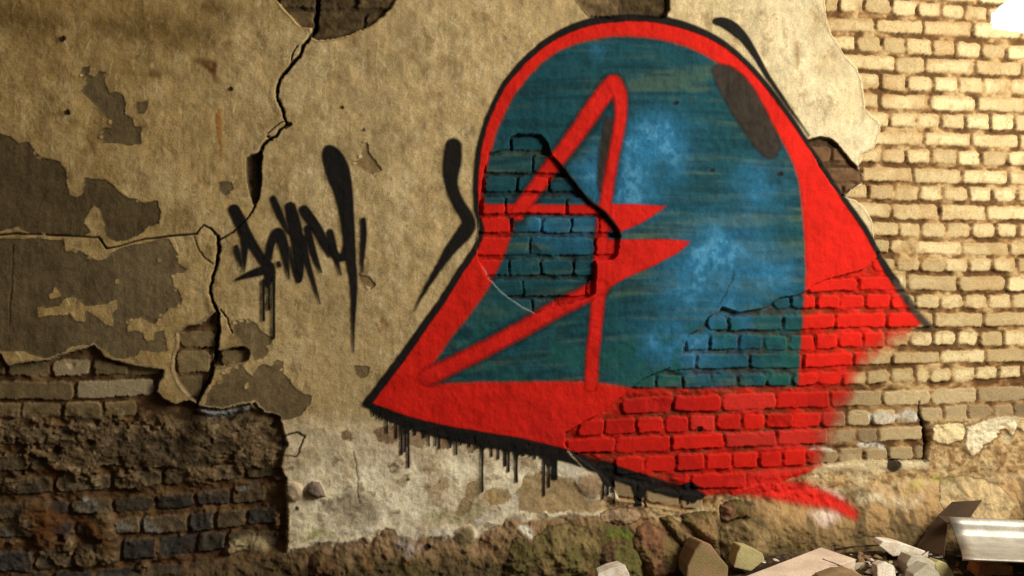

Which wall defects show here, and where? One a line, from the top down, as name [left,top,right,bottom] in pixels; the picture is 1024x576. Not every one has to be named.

flaking render [79,66,148,145]
crack [0,205,256,407]
spalling [0,134,312,576]
crack [260,0,320,150]
spalling [275,0,398,42]
spalling [482,153,538,201]
spalling [500,214,572,238]
spalling [576,0,671,18]
spalling [628,291,842,442]
spalling [792,0,1024,472]